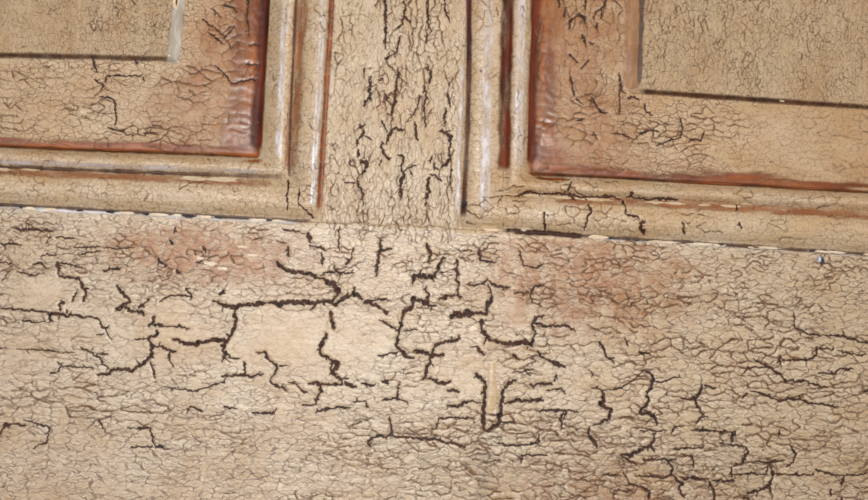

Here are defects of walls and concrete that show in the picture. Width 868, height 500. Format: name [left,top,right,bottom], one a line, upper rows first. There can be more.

crack [91,56,156,136]
crack [202,0,262,85]
crack [344,0,453,207]
crack [557,0,705,146]
crack [0,180,868,500]